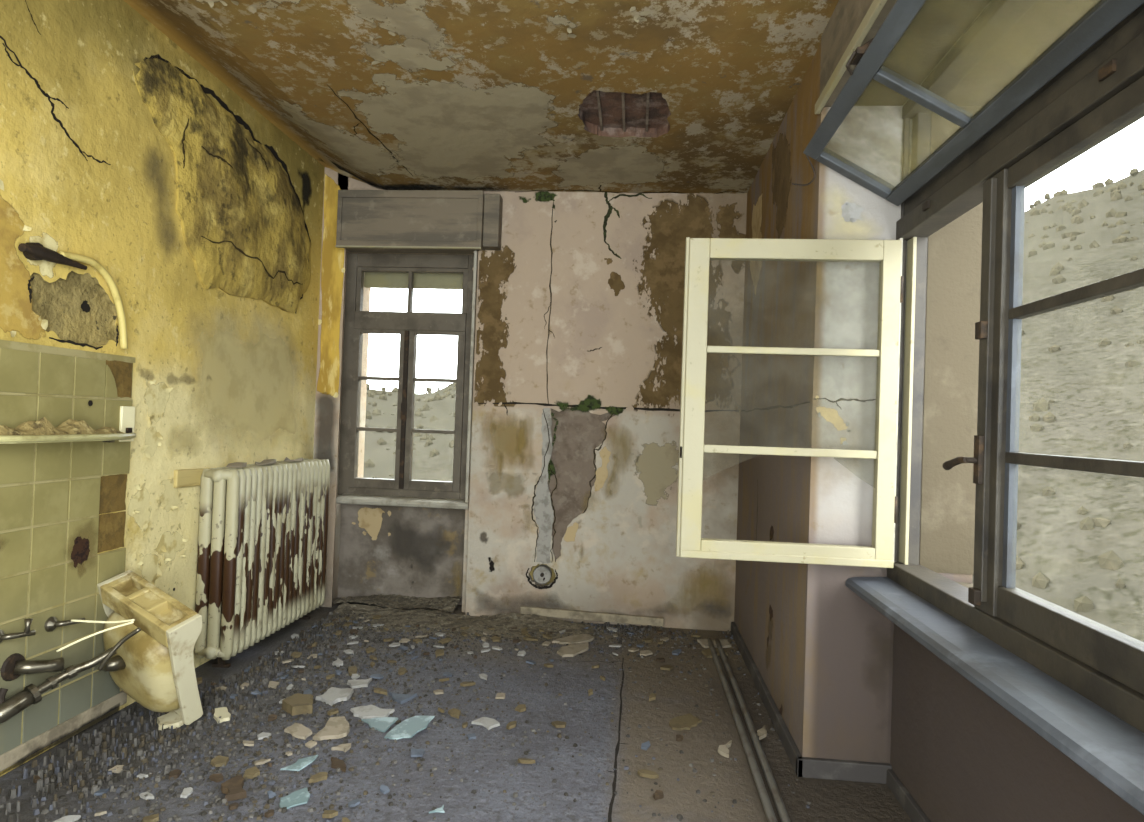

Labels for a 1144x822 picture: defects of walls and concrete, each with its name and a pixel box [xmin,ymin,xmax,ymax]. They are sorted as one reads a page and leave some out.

crack [0,36,111,165]
peeling [196,0,300,13]
peeling [269,0,558,181]
peeling [547,0,578,38]
spalling [0,179,173,460]
peeling [473,246,516,407]
peeling [548,90,792,562]
crack [478,185,876,563]
corrosion [71,537,90,568]
peeling [352,507,391,540]